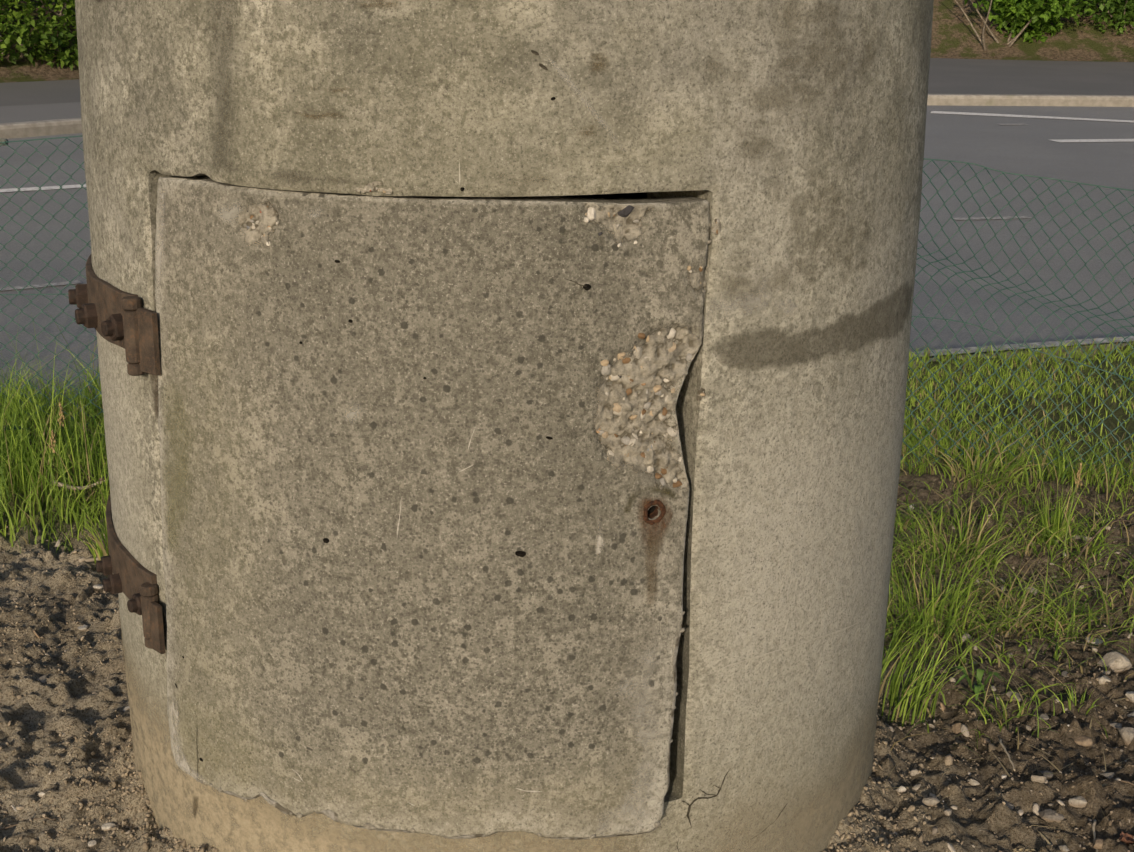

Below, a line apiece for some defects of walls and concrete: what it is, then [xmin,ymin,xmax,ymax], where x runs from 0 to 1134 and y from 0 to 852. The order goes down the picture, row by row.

spalling [236,202,279,247]
spalling [594,218,721,490]
damp [719,289,911,367]
crack [677,769,730,851]